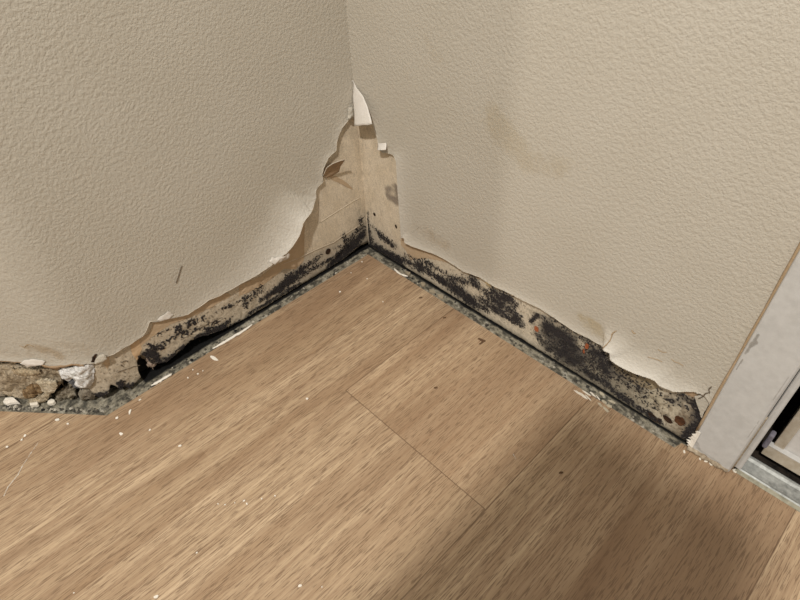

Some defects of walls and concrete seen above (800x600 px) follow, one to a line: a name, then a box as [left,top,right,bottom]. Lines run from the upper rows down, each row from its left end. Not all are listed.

peeling [0,80,709,453]
water stain [138,212,704,442]